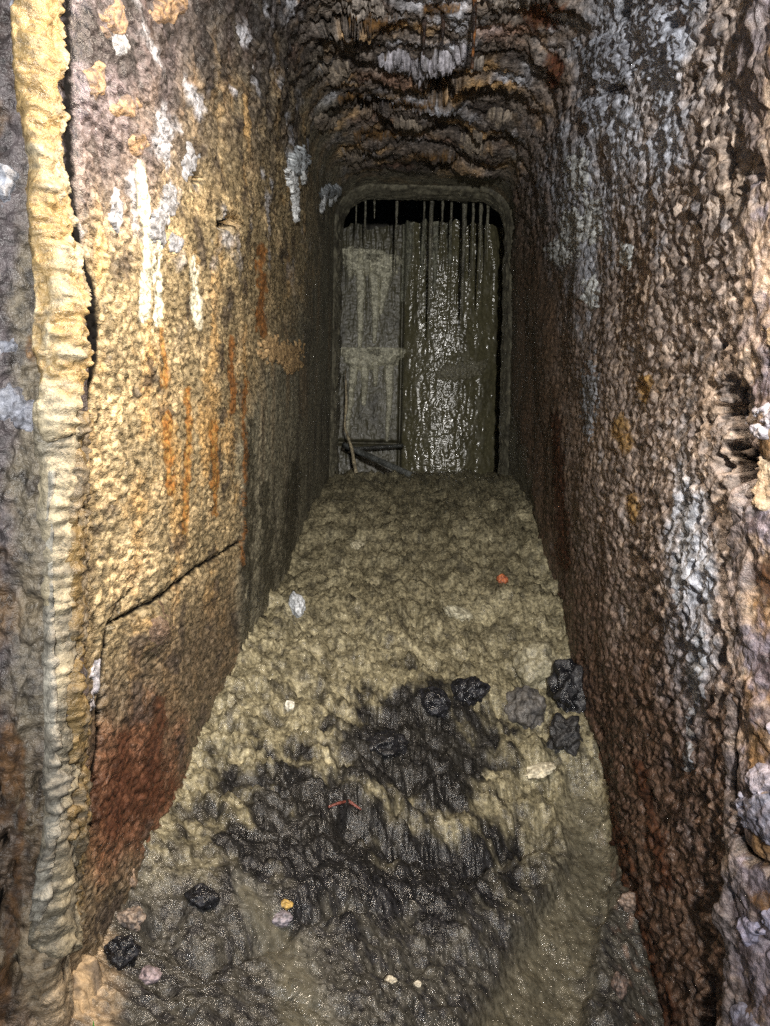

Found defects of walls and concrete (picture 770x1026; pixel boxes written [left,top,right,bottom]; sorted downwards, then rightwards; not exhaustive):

crack [62,0,98,401]
leakage [136,160,163,326]
corrosion [160,328,170,388]
leakage [190,256,203,330]
corrosion [255,243,268,338]
corrosion [162,386,194,534]
corrosion [209,420,220,517]
corrosion [227,336,249,566]
crack [90,541,238,780]